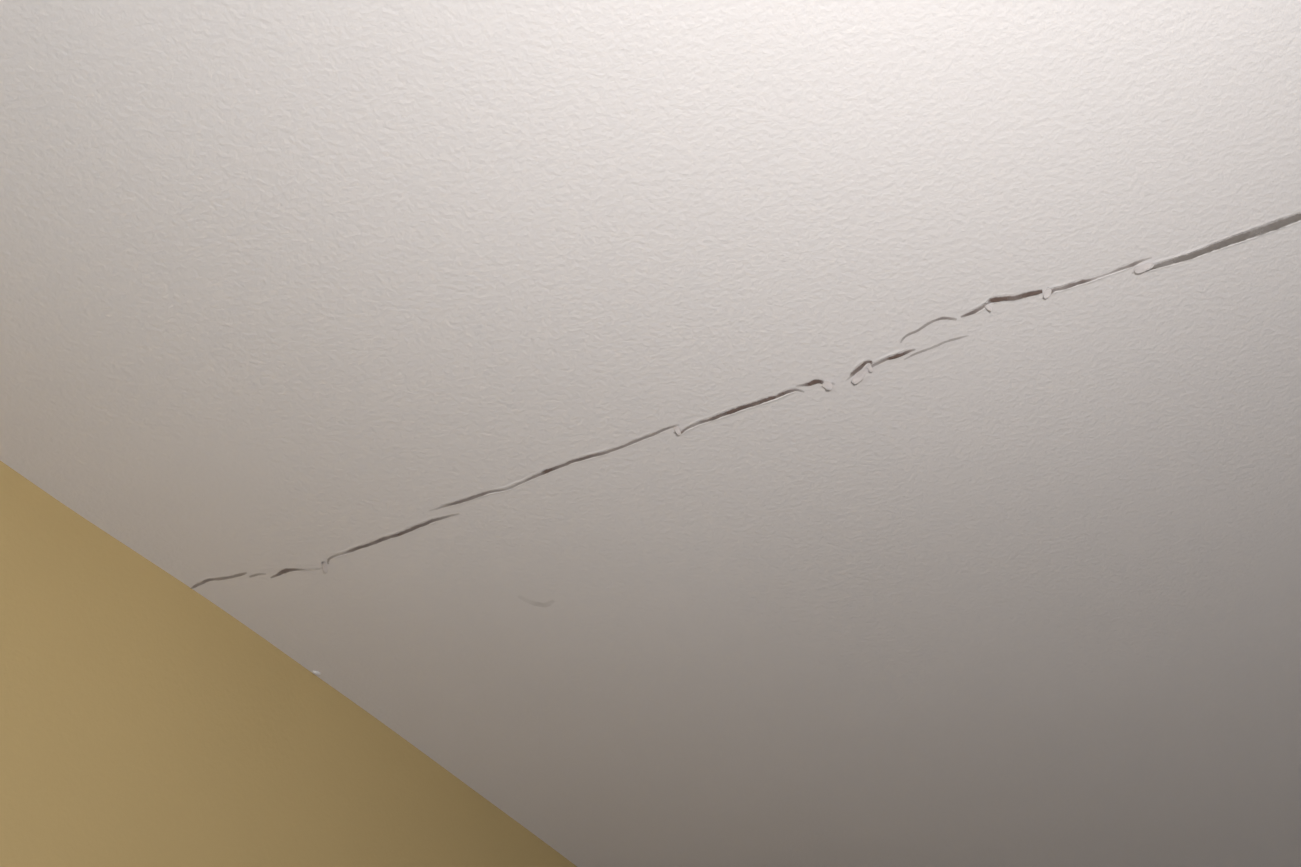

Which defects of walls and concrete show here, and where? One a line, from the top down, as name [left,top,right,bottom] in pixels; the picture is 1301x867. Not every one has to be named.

crack [940,211,1301,320]
crack [192,348,910,588]